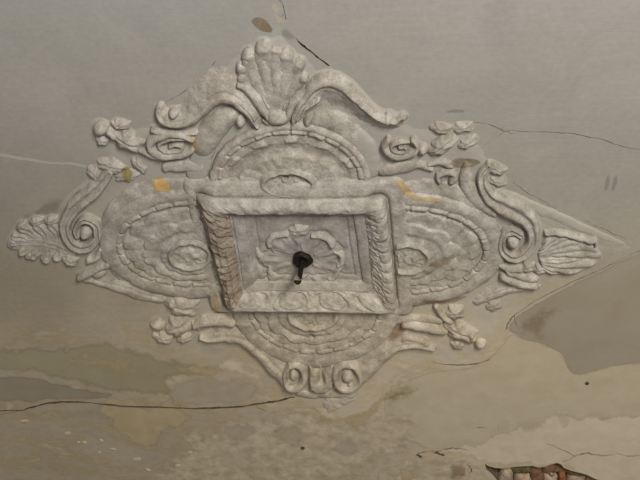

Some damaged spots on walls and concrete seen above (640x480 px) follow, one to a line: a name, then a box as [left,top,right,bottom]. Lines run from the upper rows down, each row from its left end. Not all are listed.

crack [296,38,329,66]
crack [550,132,640,150]
crack [506,251,639,329]
crack [0,397,295,415]
peeling [384,336,640,480]